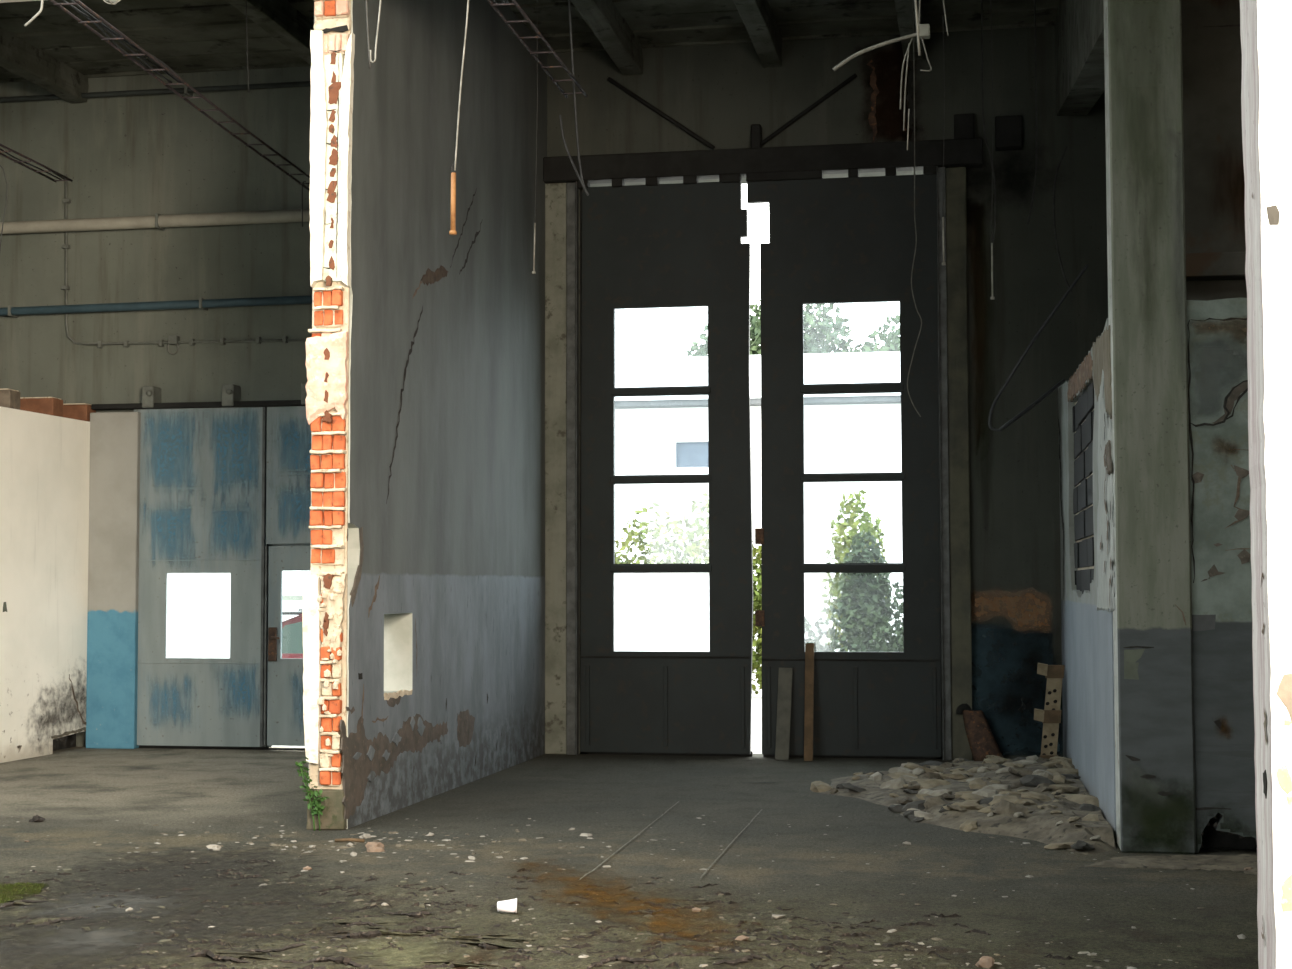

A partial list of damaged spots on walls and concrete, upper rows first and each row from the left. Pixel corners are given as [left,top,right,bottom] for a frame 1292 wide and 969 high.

crack [450,188,483,274]
crack [386,307,423,504]
peeling [1067,325,1116,612]
flaking render [279,286,476,819]
peeling [1277,673,1292,726]
peeling [1263,765,1292,811]
peeling [1281,874,1292,912]